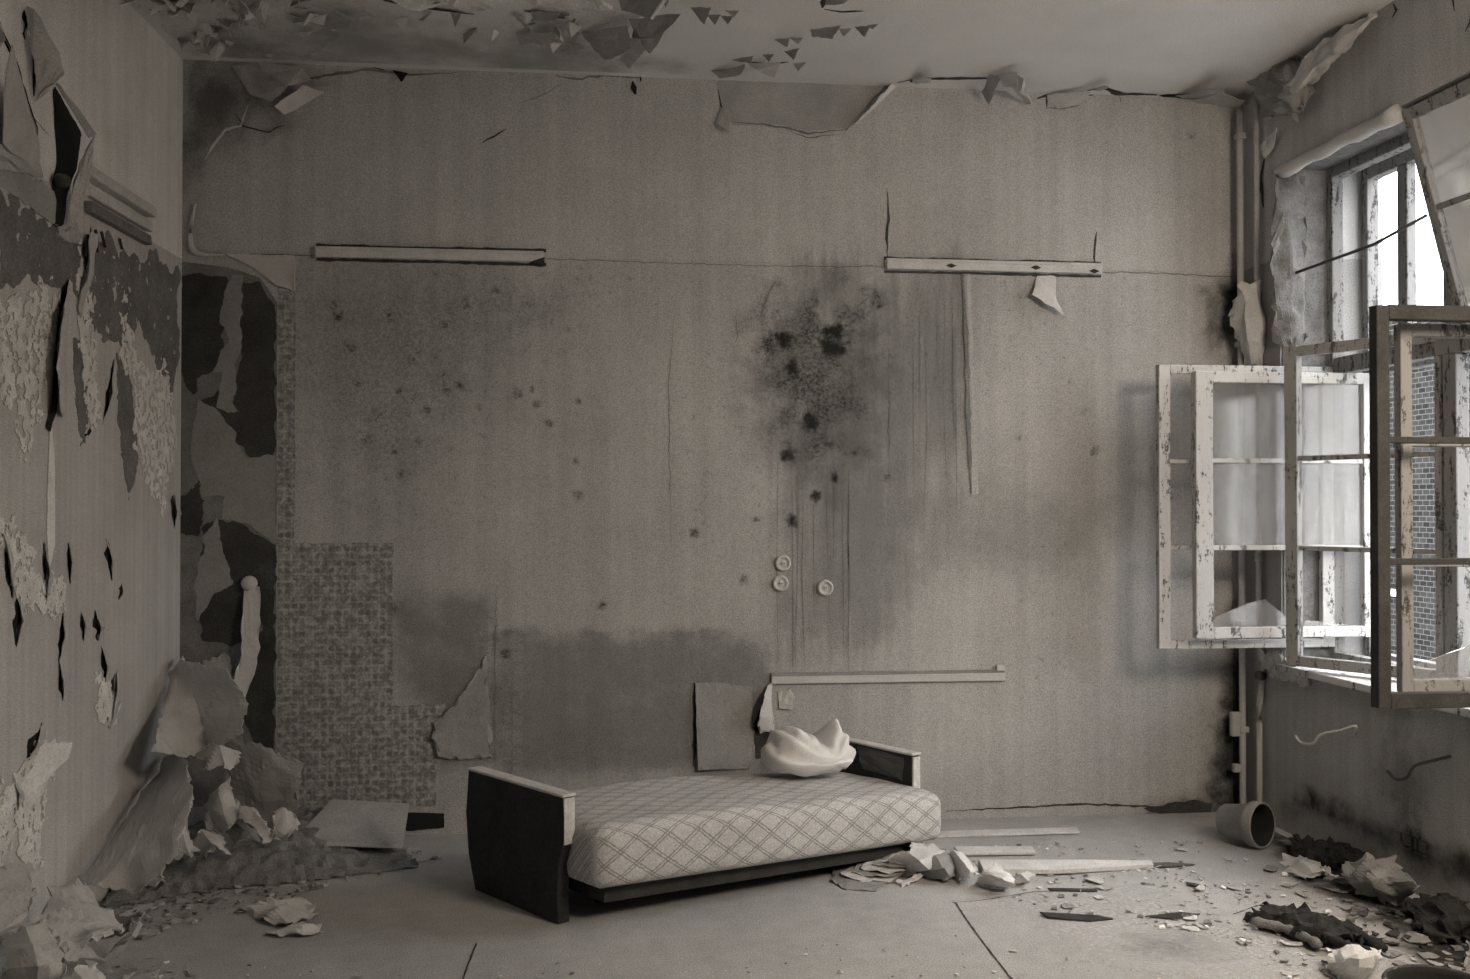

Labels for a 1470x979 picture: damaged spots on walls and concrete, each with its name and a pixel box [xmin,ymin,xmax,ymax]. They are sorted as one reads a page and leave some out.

peeling [120,0,740,115]
peeling [712,24,931,138]
peeling [1189,12,1406,346]
peeling [0,6,296,750]
leakage [764,294,890,687]
peeling [0,730,73,869]
peeling [185,747,226,807]
peeling [432,655,493,760]